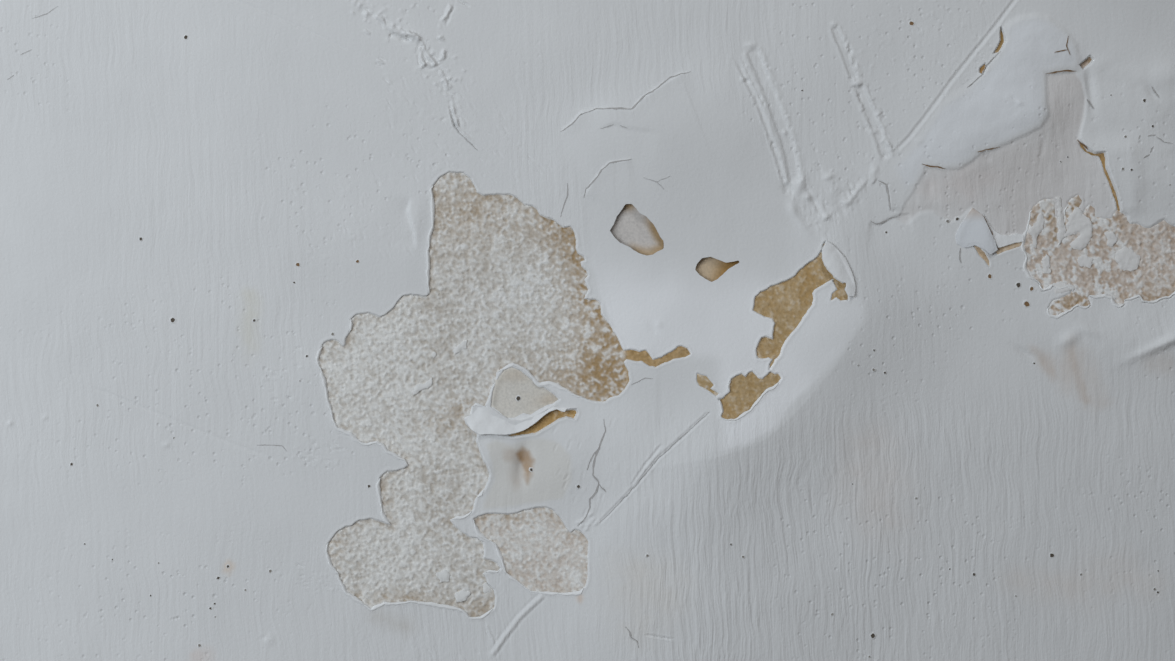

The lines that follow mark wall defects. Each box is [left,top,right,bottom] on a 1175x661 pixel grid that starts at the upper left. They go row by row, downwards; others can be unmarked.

crack [560,71,691,132]
crack [560,159,670,217]
spalling [900,53,1175,319]
peeling [822,242,856,300]
spalling [316,172,690,619]
peeling [697,373,718,396]